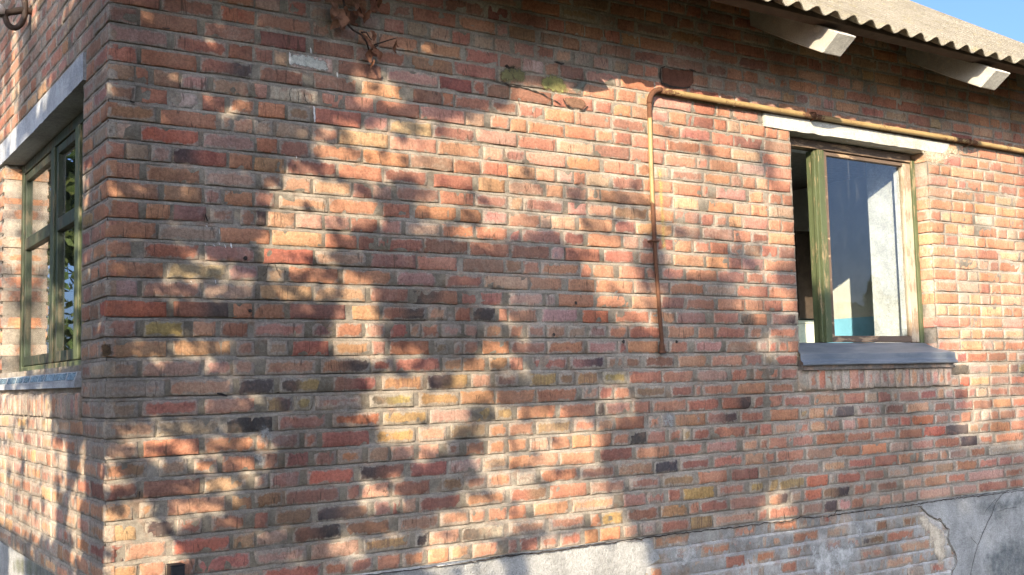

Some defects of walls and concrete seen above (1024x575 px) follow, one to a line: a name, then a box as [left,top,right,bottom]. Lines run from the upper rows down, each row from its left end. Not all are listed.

crack [368,490,1024,575]
spalling [605,496,961,575]